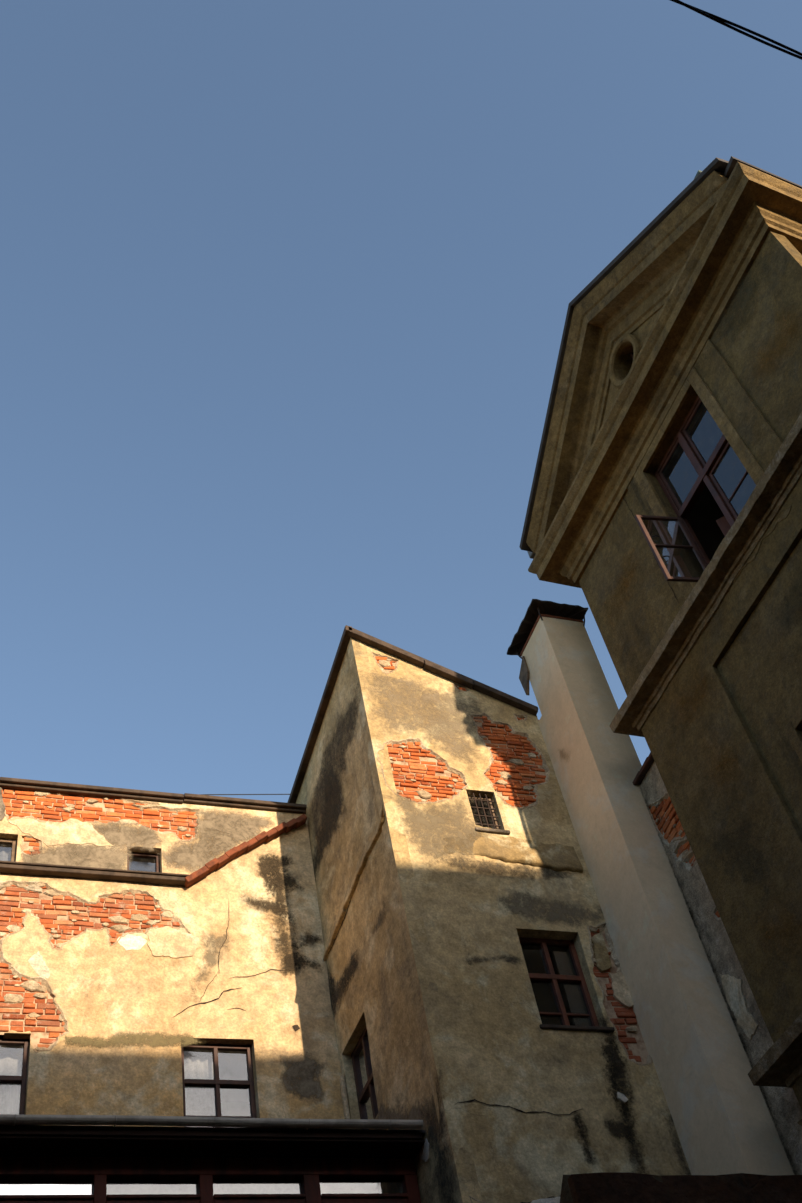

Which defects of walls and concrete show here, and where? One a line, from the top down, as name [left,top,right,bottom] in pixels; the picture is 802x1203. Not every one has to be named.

flaking render [376,713,550,809]
flaking render [15,835,43,857]
flaking render [1,789,200,842]
flaking render [647,792,697,872]
flaking render [0,880,192,1053]
crack [174,921,293,1017]
flaking render [576,921,653,1066]
crack [456,1099,582,1115]